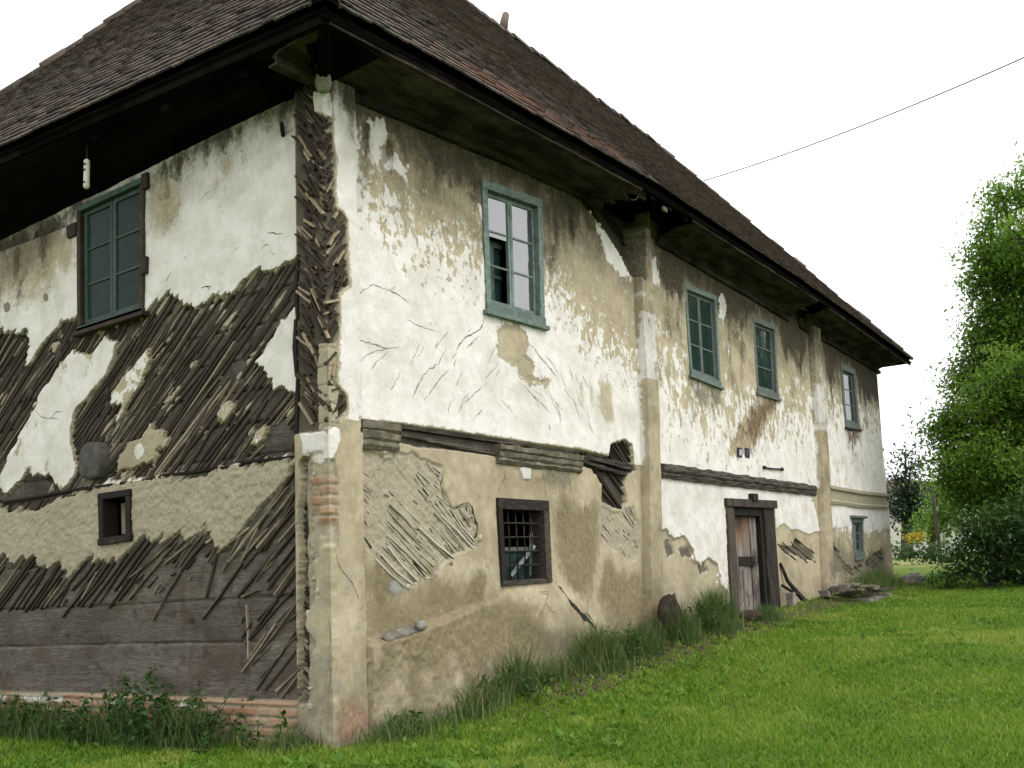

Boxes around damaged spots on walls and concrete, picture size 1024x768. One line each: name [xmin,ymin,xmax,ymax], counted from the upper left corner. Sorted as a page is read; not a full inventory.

water stain [149,127,241,228]
water stain [338,81,602,264]
water stain [0,198,93,298]
peeling [355,107,633,394]
flaking render [0,335,116,495]
flaking render [110,349,151,422]
flaking render [116,422,171,472]
flaking render [255,307,296,392]
crack [359,284,507,418]
water stain [658,230,880,407]
crack [528,586,594,629]
peeling [662,528,730,627]